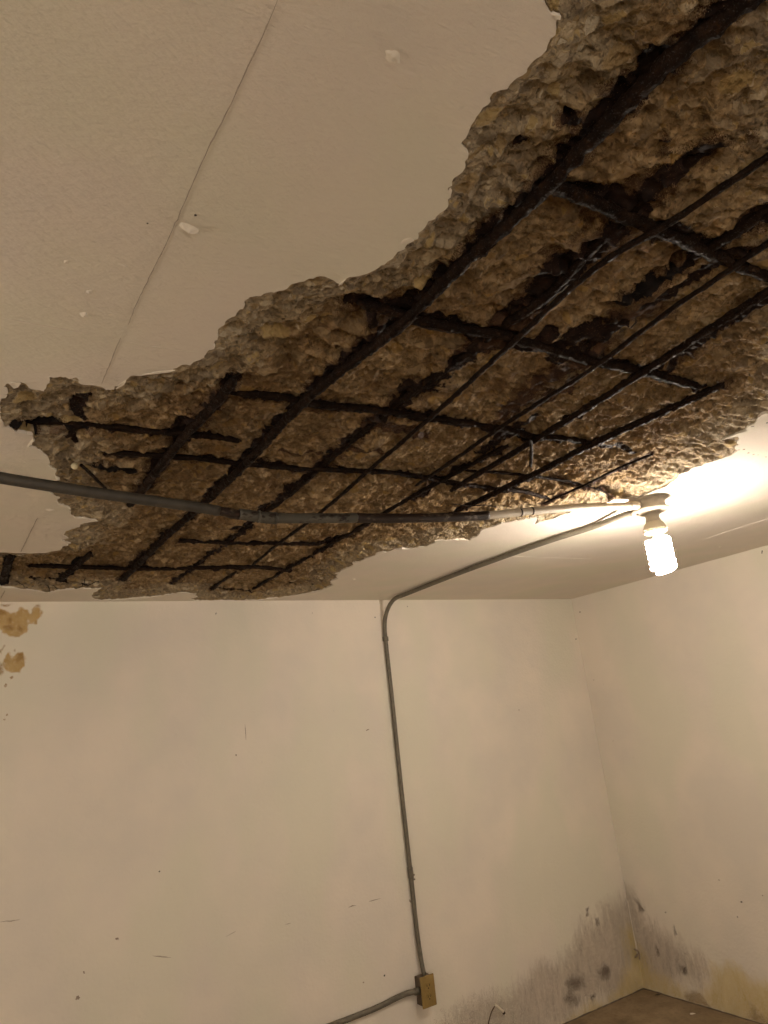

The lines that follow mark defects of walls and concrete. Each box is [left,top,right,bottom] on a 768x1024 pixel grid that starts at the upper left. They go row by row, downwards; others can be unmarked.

rust [0,0,768,593]
spalling [0,0,768,600]
leakage [433,883,768,1024]